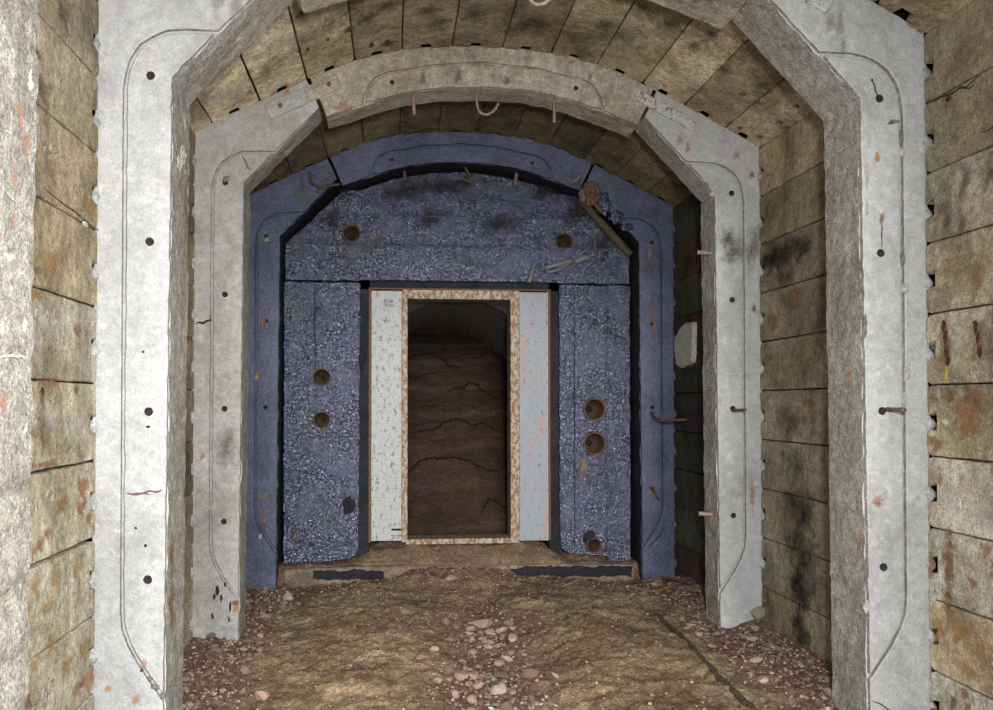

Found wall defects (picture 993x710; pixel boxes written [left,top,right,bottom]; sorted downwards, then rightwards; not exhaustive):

rust [75,669,94,695]